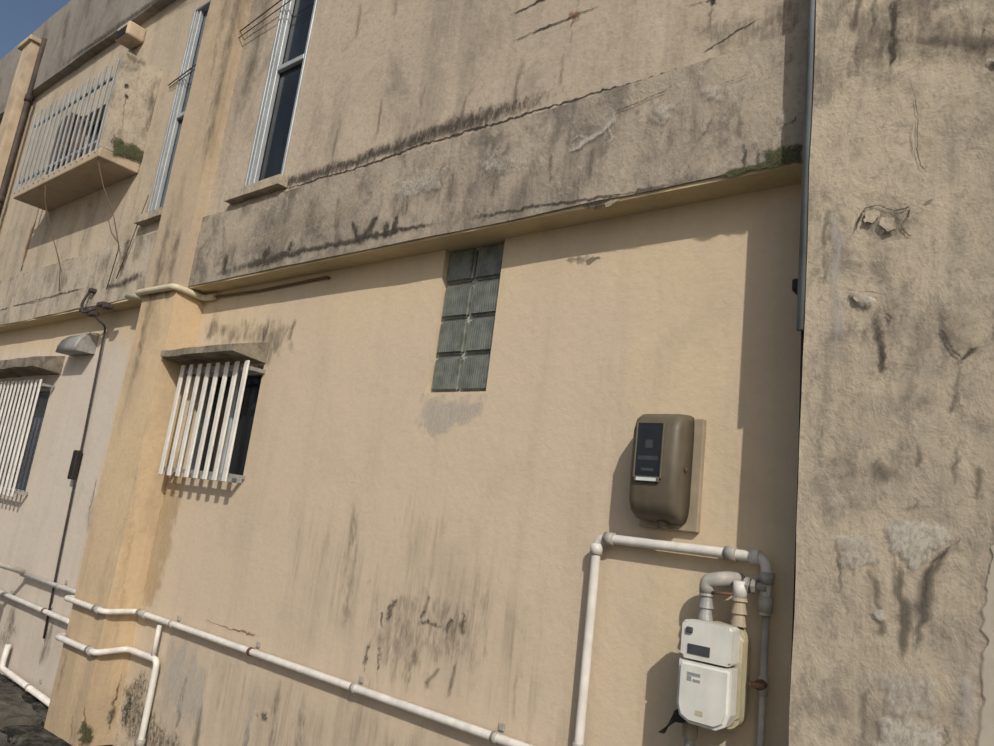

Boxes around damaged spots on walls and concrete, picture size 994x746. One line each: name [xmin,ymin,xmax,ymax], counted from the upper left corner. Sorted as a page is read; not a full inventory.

crack [515,0,597,40]
crack [706,21,754,59]
crack [270,69,676,194]
damp [218,215,432,274]
peeling [876,673,950,746]